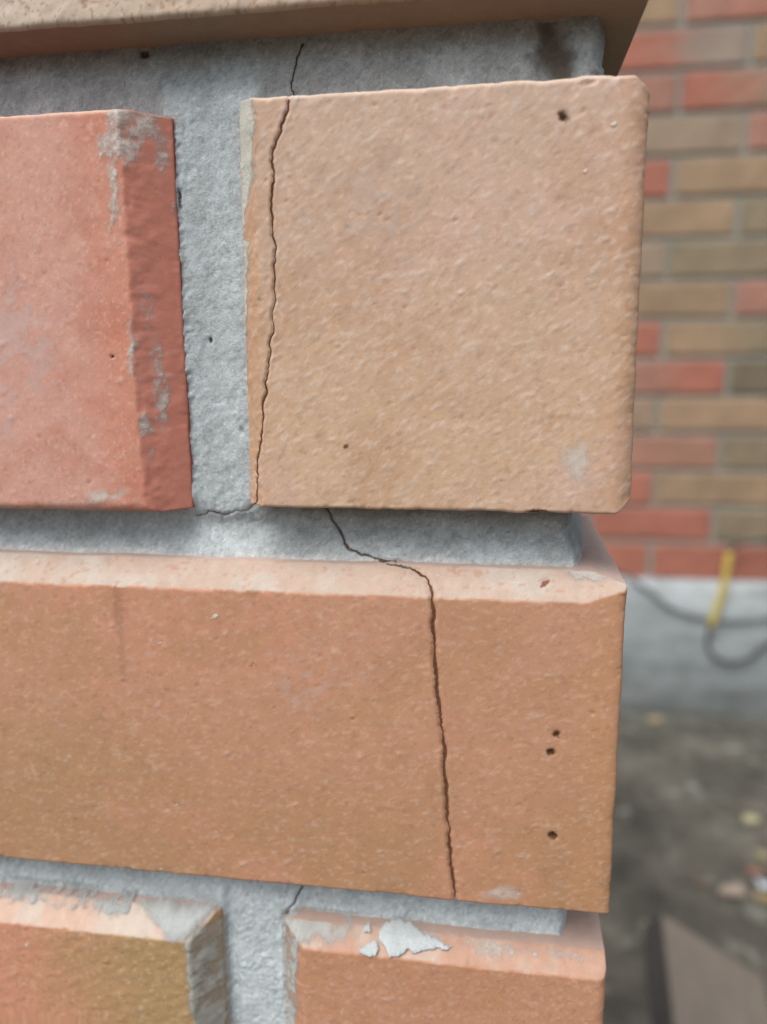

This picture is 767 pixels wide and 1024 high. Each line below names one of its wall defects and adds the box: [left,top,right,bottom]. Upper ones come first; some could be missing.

peeling [139,348,169,436]
crack [196,43,304,517]
crack [325,508,456,897]
peeling [358,918,452,958]